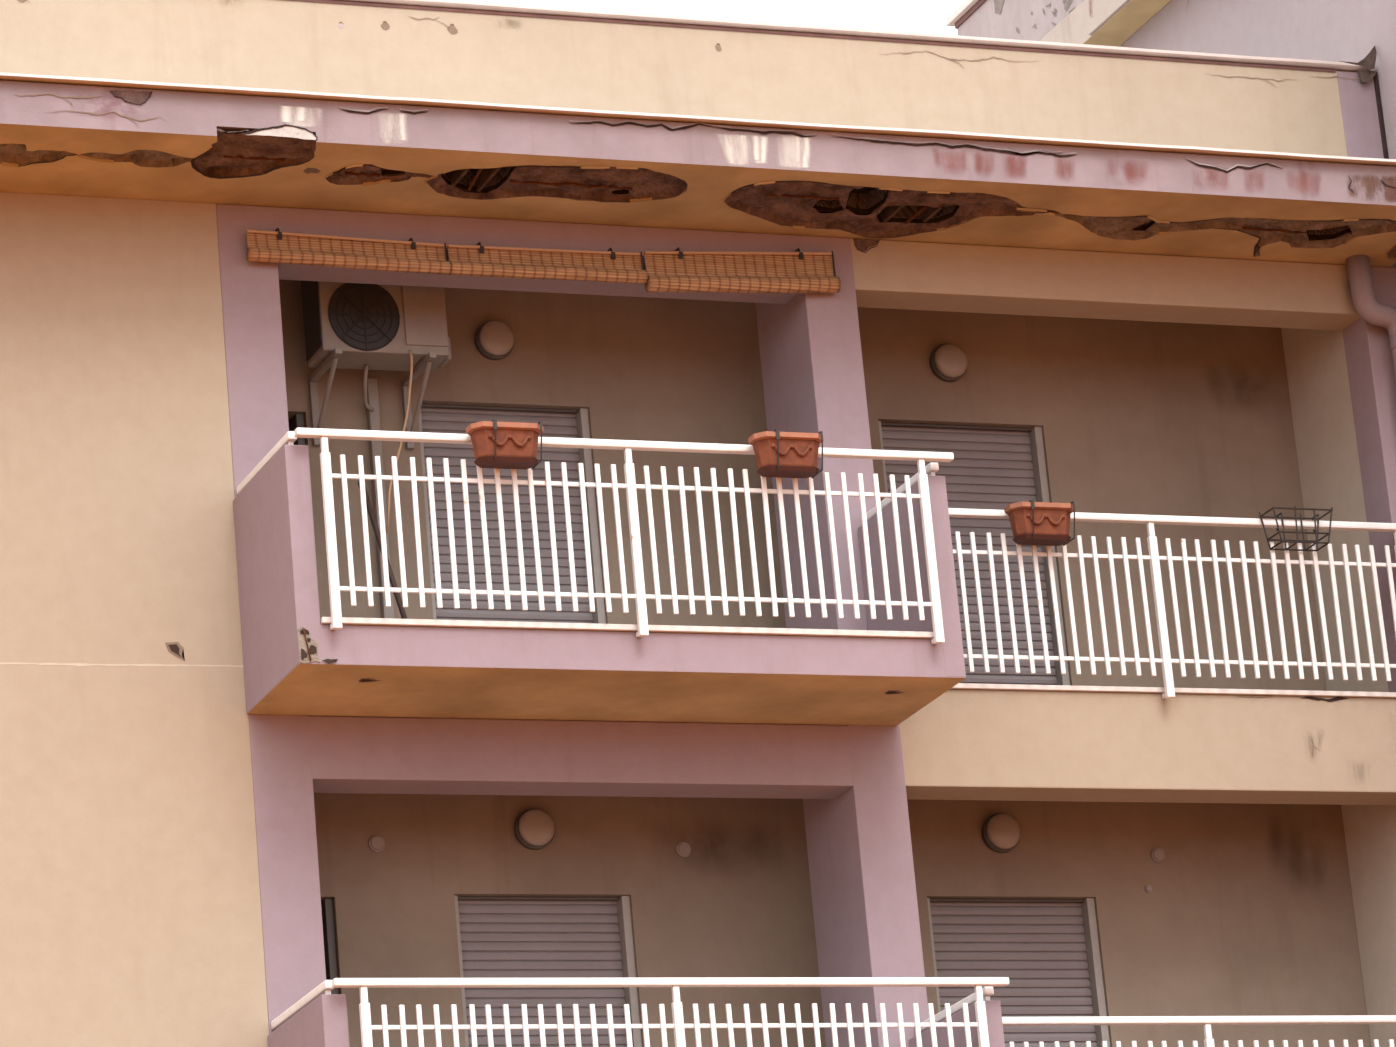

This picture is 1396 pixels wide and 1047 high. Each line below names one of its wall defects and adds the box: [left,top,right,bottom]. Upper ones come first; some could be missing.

peeling [994,0,1004,14]
peeling [1016,0,1084,34]
crack [890,51,1034,67]
spalling [0,124,688,203]
spalling [723,181,1396,263]
flaking render [165,642,185,661]
spalling [298,627,338,664]